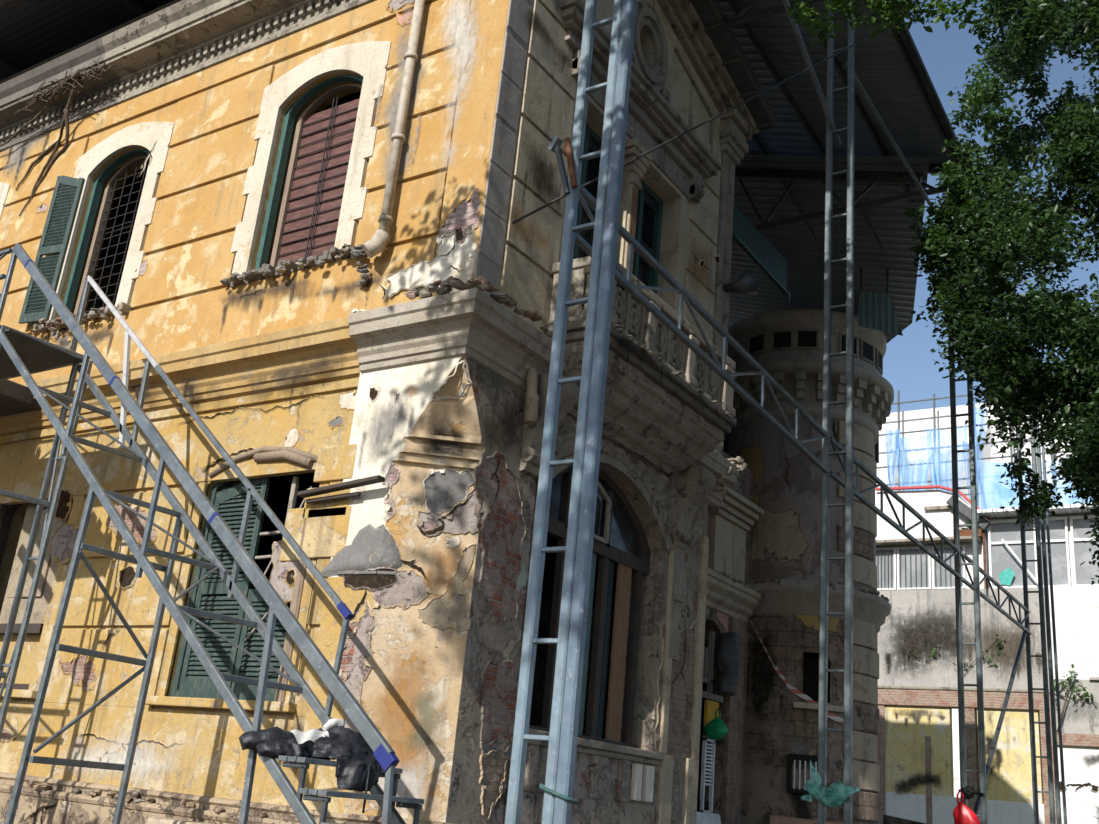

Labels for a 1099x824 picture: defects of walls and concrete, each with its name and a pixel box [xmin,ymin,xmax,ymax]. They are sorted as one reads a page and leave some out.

damp [515,146,561,243]
spalling [220,244,372,286]
peeling [386,188,553,338]
spalling [106,503,159,546]
crack [417,459,500,535]
crack [400,559,429,582]
spalling [339,451,529,708]
spalling [59,655,98,692]
damp [886,614,1041,674]
spalling [479,658,521,821]
damp [896,774,940,793]
crack [1066,782,1099,792]